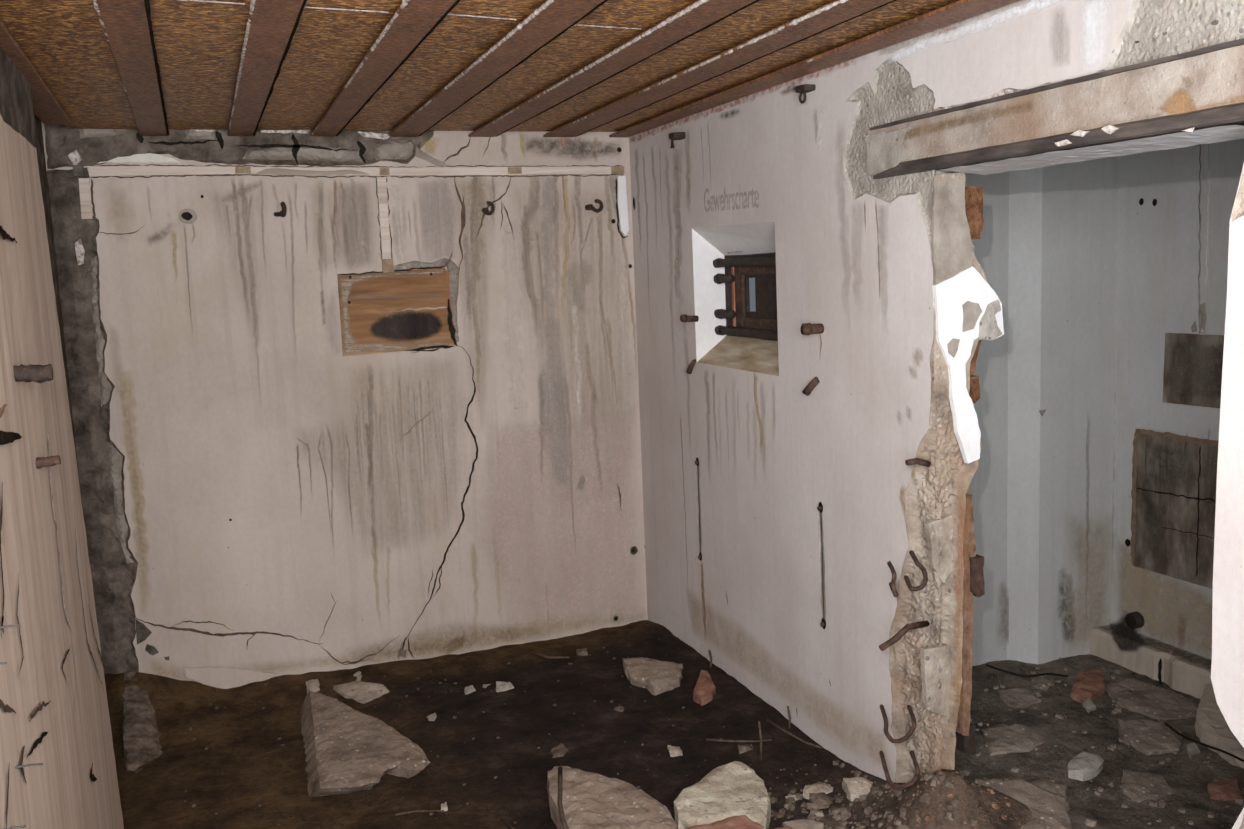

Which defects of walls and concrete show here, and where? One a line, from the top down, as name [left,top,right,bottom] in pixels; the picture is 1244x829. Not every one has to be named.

crack [0,482,108,828]
peeling [183,666,277,689]
spalling [44,124,447,674]
crack [131,345,478,665]
spalling [394,258,459,343]
spalling [843,58,1070,789]
spalling [1089,0,1244,75]
spalling [1231,167,1244,221]